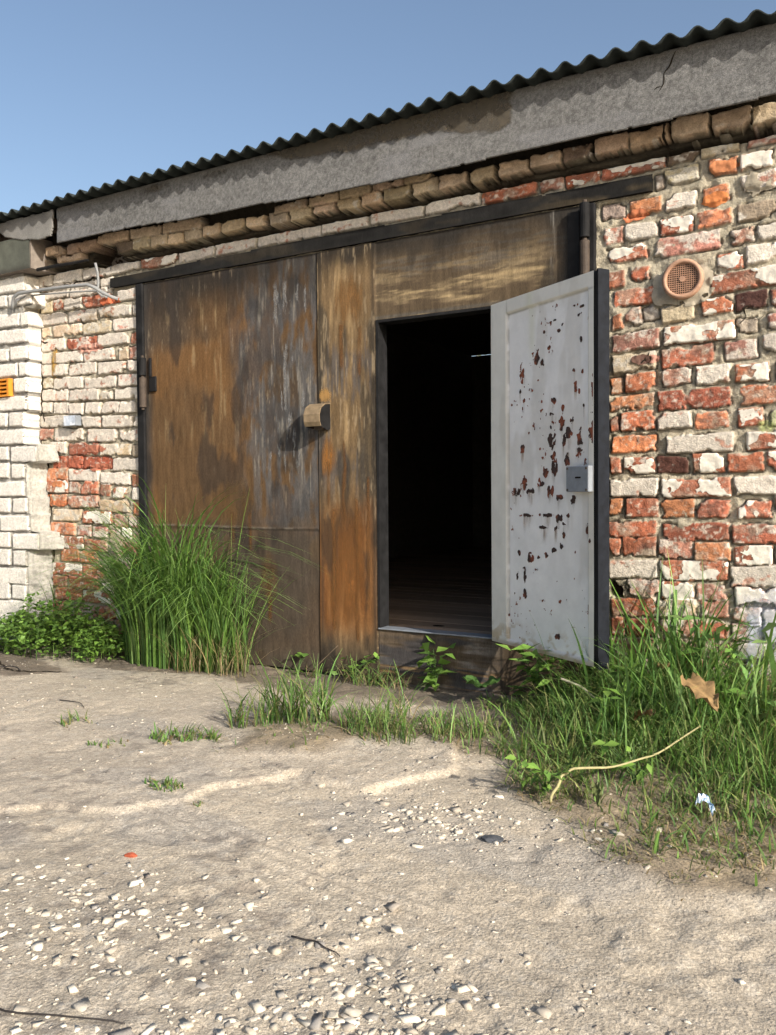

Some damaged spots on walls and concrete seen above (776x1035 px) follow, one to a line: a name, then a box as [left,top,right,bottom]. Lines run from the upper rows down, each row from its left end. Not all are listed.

crack [655,51,676,91]
peeling [709,150,773,175]
peeling [623,208,693,235]
peeling [751,264,776,284]
peeling [631,251,742,365]
peeling [738,408,776,460]
corrosion [323,445,333,502]
corrosion [508,304,593,645]
peeling [624,457,683,498]
peeling [694,453,731,497]
peeling [659,545,773,600]
peeling [734,586,776,606]